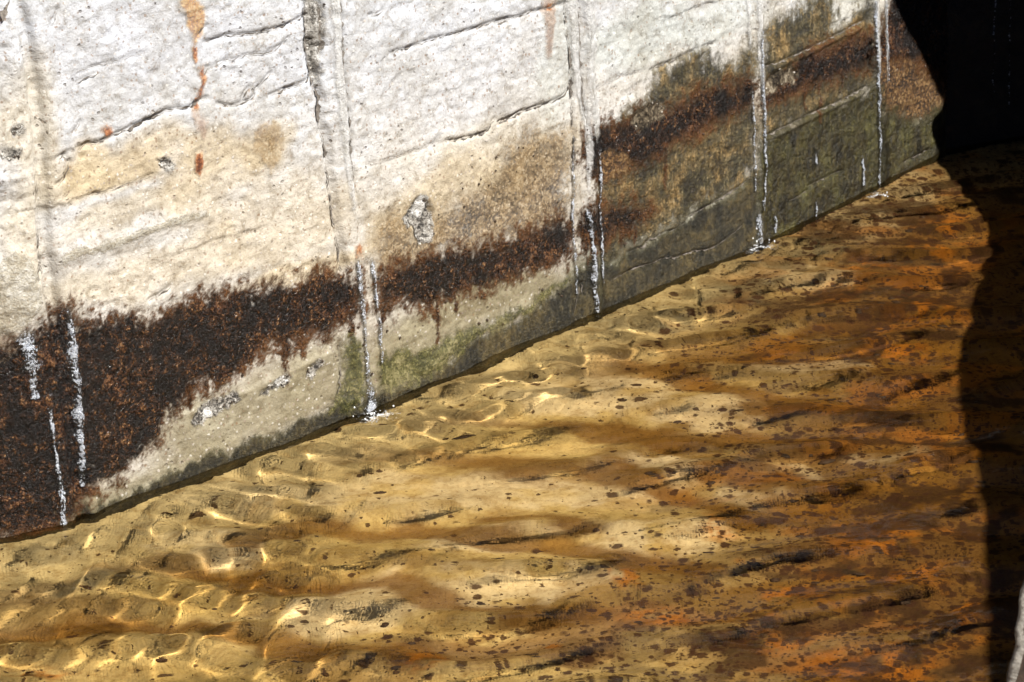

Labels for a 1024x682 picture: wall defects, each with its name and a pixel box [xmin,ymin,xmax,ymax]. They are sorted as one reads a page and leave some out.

corrosion [181,0,207,109]
corrosion [195,152,204,175]
spalling [402,193,434,245]
damp [0,0,948,538]